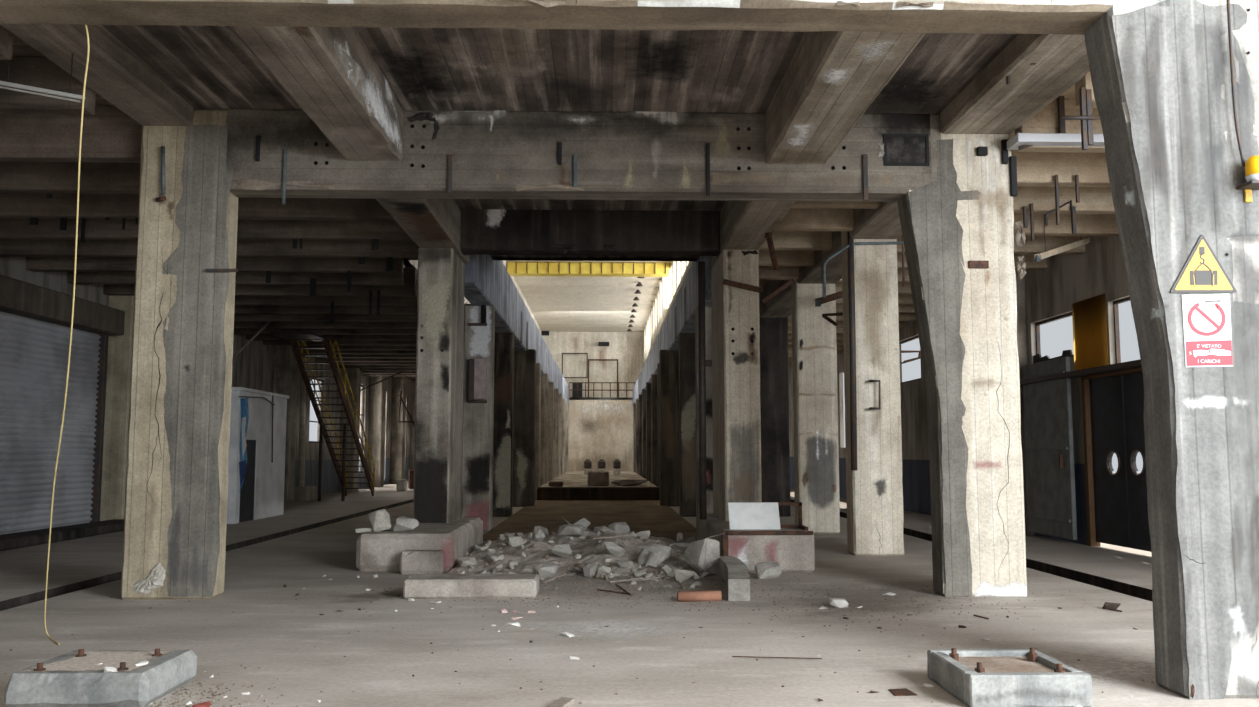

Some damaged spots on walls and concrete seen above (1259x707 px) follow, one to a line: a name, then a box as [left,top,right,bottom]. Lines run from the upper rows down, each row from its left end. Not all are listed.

leakage [637,40,693,79]
crack [147,249,171,501]
leakage [806,431,834,507]